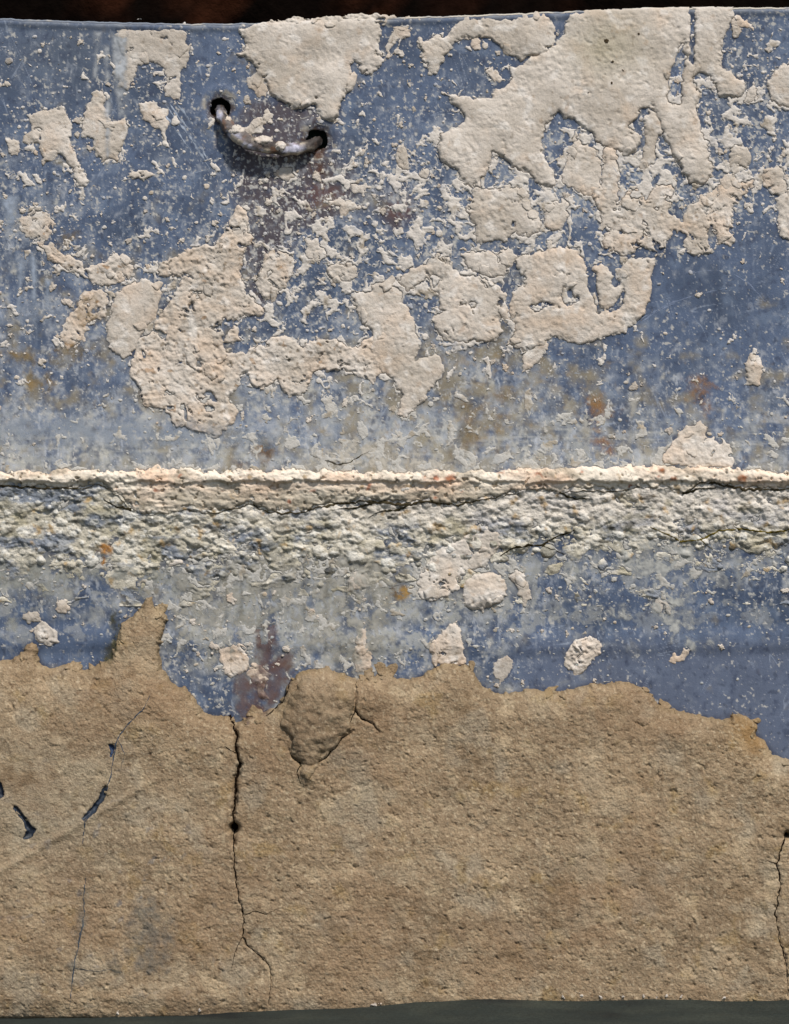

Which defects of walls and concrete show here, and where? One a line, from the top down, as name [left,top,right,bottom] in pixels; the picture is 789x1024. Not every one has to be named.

peeling [5,6,789,439]
peeling [662,421,734,468]
crack [0,482,789,517]
crack [500,530,574,556]
crack [650,527,789,551]
peeling [22,612,59,646]
peeling [218,643,272,699]
rust [235,625,293,715]
peeling [429,620,466,667]
peeling [564,636,602,675]
crack [219,715,275,1003]
crack [765,832,788,988]